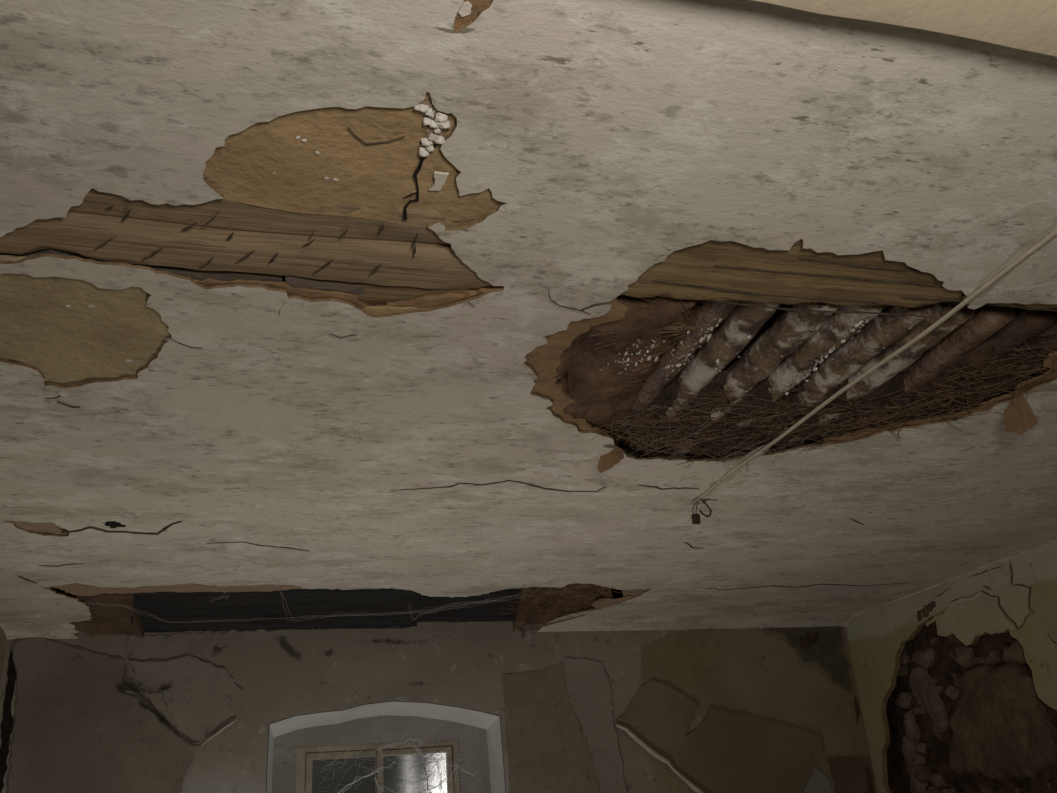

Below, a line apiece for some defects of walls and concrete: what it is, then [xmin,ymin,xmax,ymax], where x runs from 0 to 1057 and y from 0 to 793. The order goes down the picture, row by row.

flaking render [203,92,502,228]
flaking render [0,255,171,385]
flaking render [194,278,503,316]
flaking render [525,295,699,473]
flaking render [824,351,1057,442]
crack [401,480,608,493]
crack [636,483,699,491]
flaking render [52,583,305,637]
flaking render [513,583,648,632]
crack [707,582,909,591]
crack [926,562,1057,647]
spalling [886,585,1057,793]